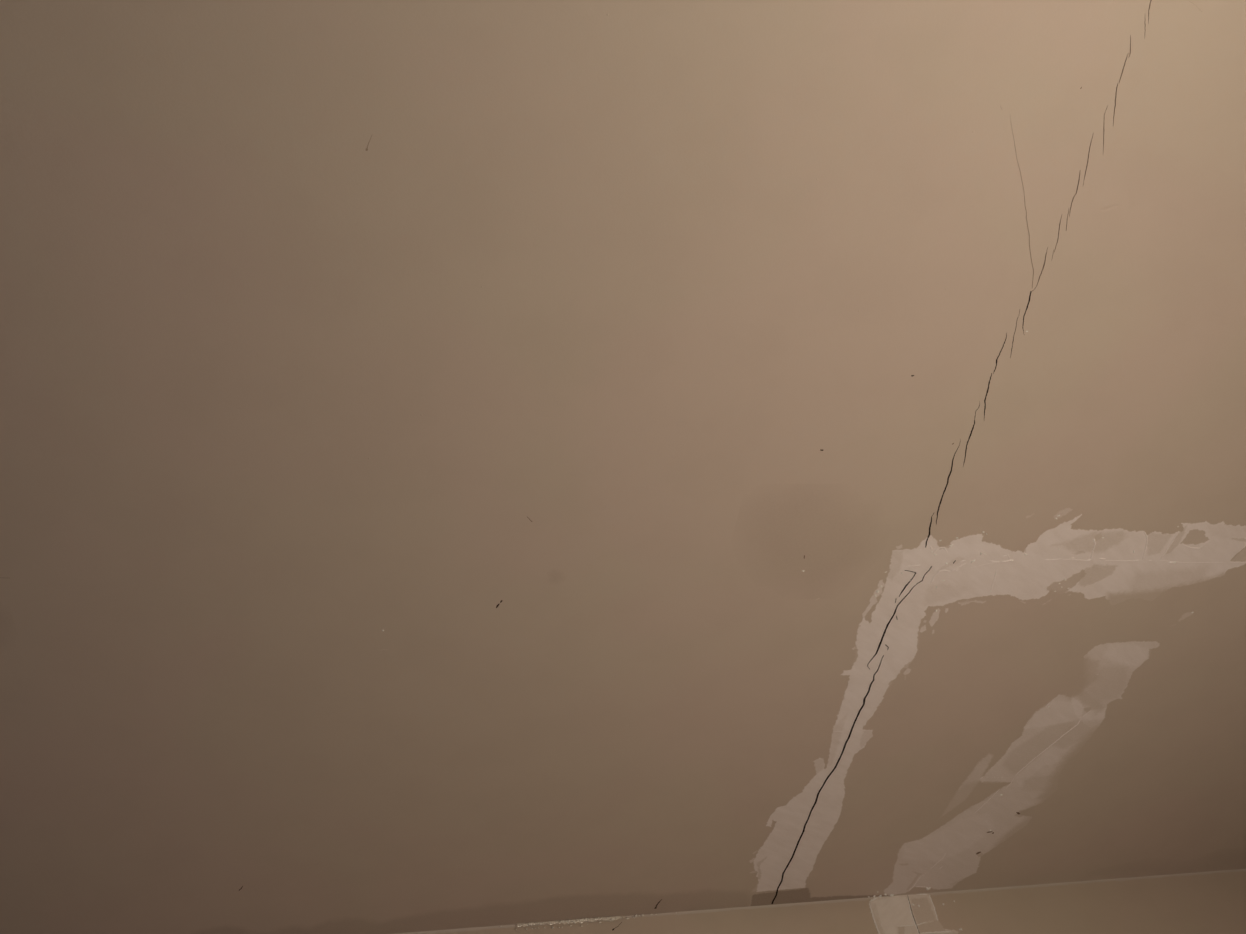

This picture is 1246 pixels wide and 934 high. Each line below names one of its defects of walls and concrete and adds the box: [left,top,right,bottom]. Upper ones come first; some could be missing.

crack [772,0,1152,904]